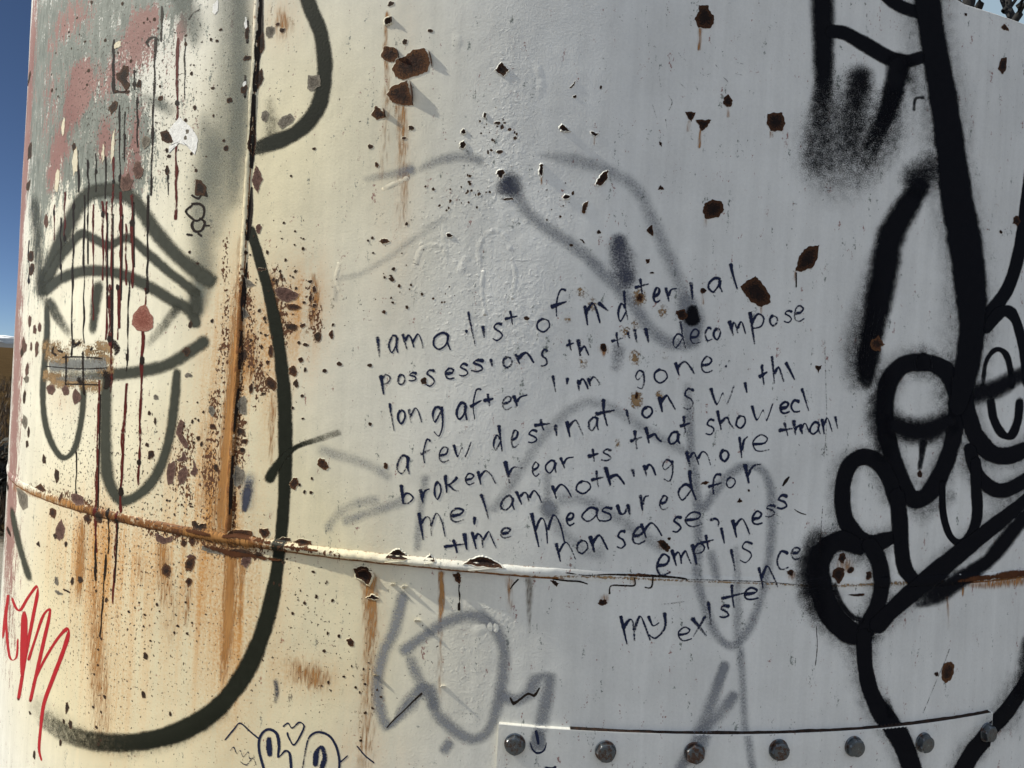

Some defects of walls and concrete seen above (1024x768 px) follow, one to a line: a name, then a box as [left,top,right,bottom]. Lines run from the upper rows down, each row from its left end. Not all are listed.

peeling [380,38,408,63]
peeling [371,105,387,120]
rust [14,237,340,718]
peeling [384,548,410,563]
peeling [452,555,504,585]
rust [958,570,1024,596]
rust [364,577,377,655]